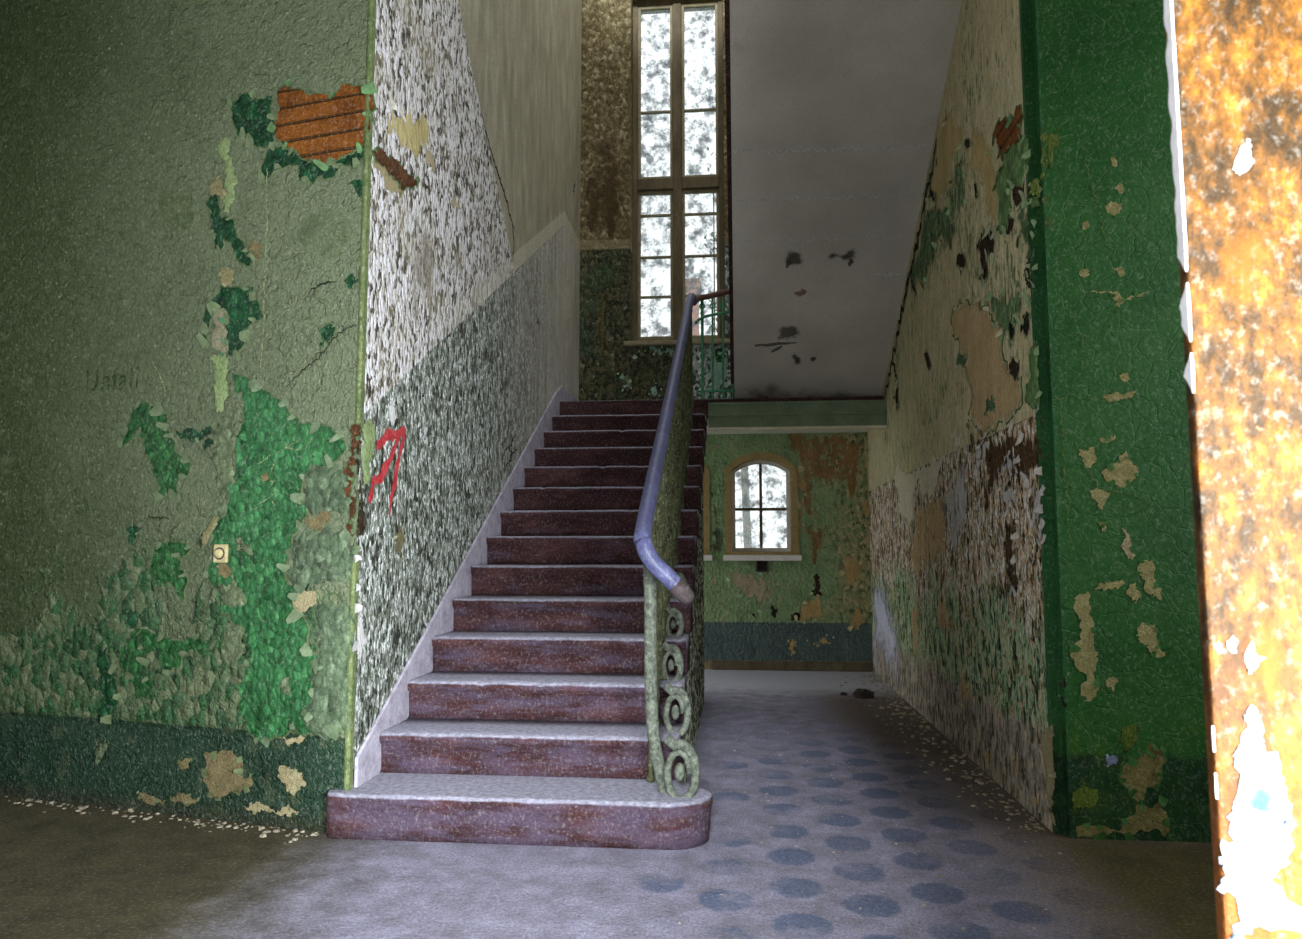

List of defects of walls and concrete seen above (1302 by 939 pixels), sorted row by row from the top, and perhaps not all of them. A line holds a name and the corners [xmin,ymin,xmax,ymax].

peeling [94,78,437,765]
spalling [894,104,1060,557]
peeling [709,564,826,624]
spalling [788,439,871,656]
spalling [1058,435,1165,708]
spalling [136,750,306,817]
spalling [1034,725,1056,826]
spalling [1072,724,1172,841]
peeling [1217,705,1302,939]